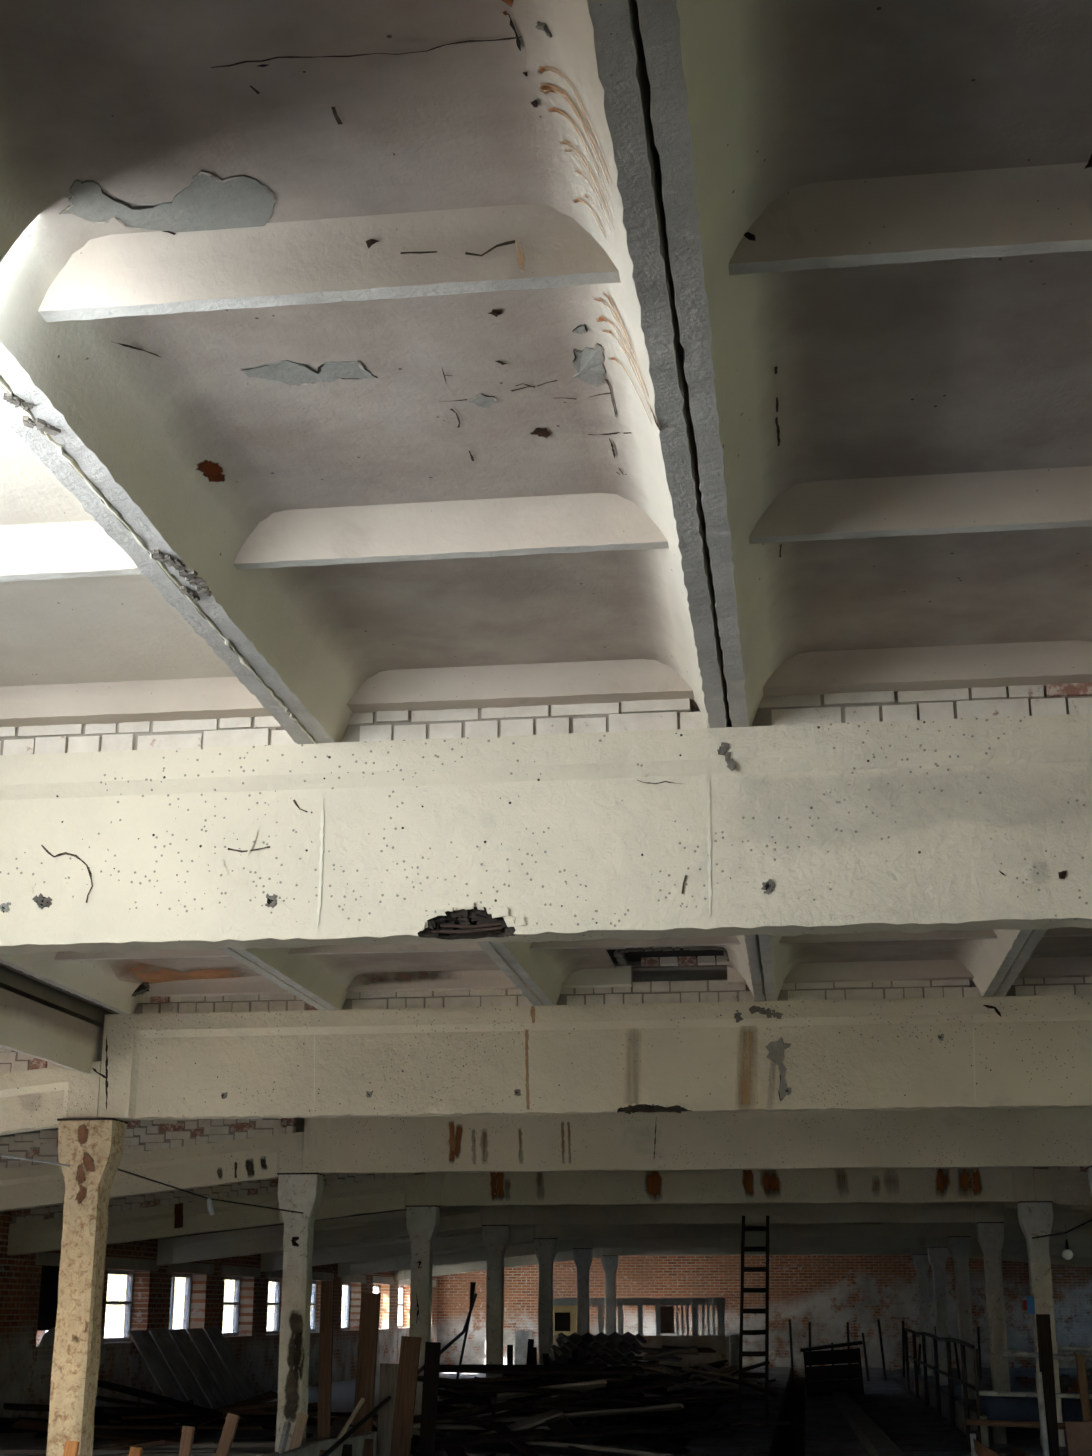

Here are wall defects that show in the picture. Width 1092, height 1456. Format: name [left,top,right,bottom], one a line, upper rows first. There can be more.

crack [211,21,552,94]
rust [502,0,521,51]
rust [538,66,612,234]
peeling [59,171,277,235]
peeling [240,360,377,387]
peeling [572,324,606,388]
rust [595,294,660,430]
crack [773,366,781,446]
crack [41,845,93,903]
spalling [408,902,526,937]
spalling [734,1005,782,1023]
leakage [284,1310,305,1422]